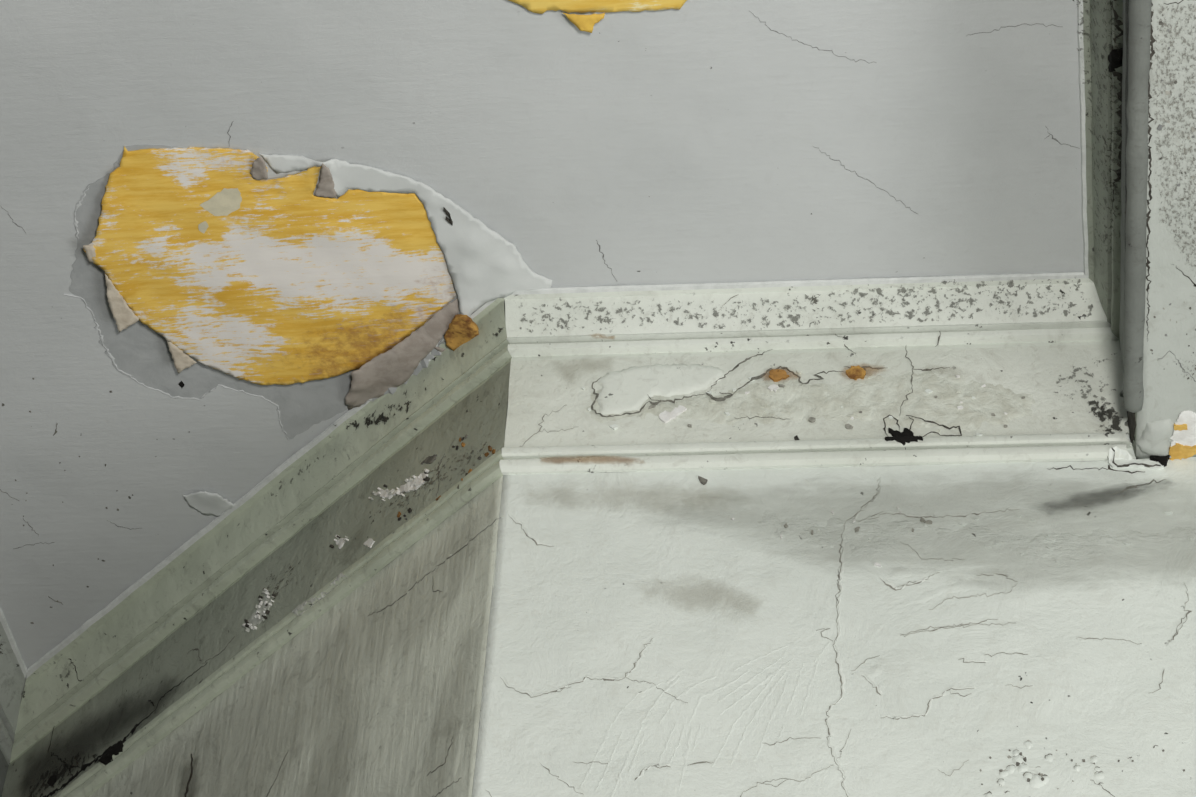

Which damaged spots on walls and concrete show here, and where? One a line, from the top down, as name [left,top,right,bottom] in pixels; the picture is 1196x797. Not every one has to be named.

peeling [509,0,687,33]
peeling [64,145,552,440]
crack [523,331,950,445]
corrosion [769,369,790,382]
corrosion [846,366,866,380]
flaking render [368,454,437,521]
crack [368,514,553,616]
crack [740,477,1028,797]
crack [1076,583,1192,693]
water stain [24,694,164,797]
crack [427,737,460,797]